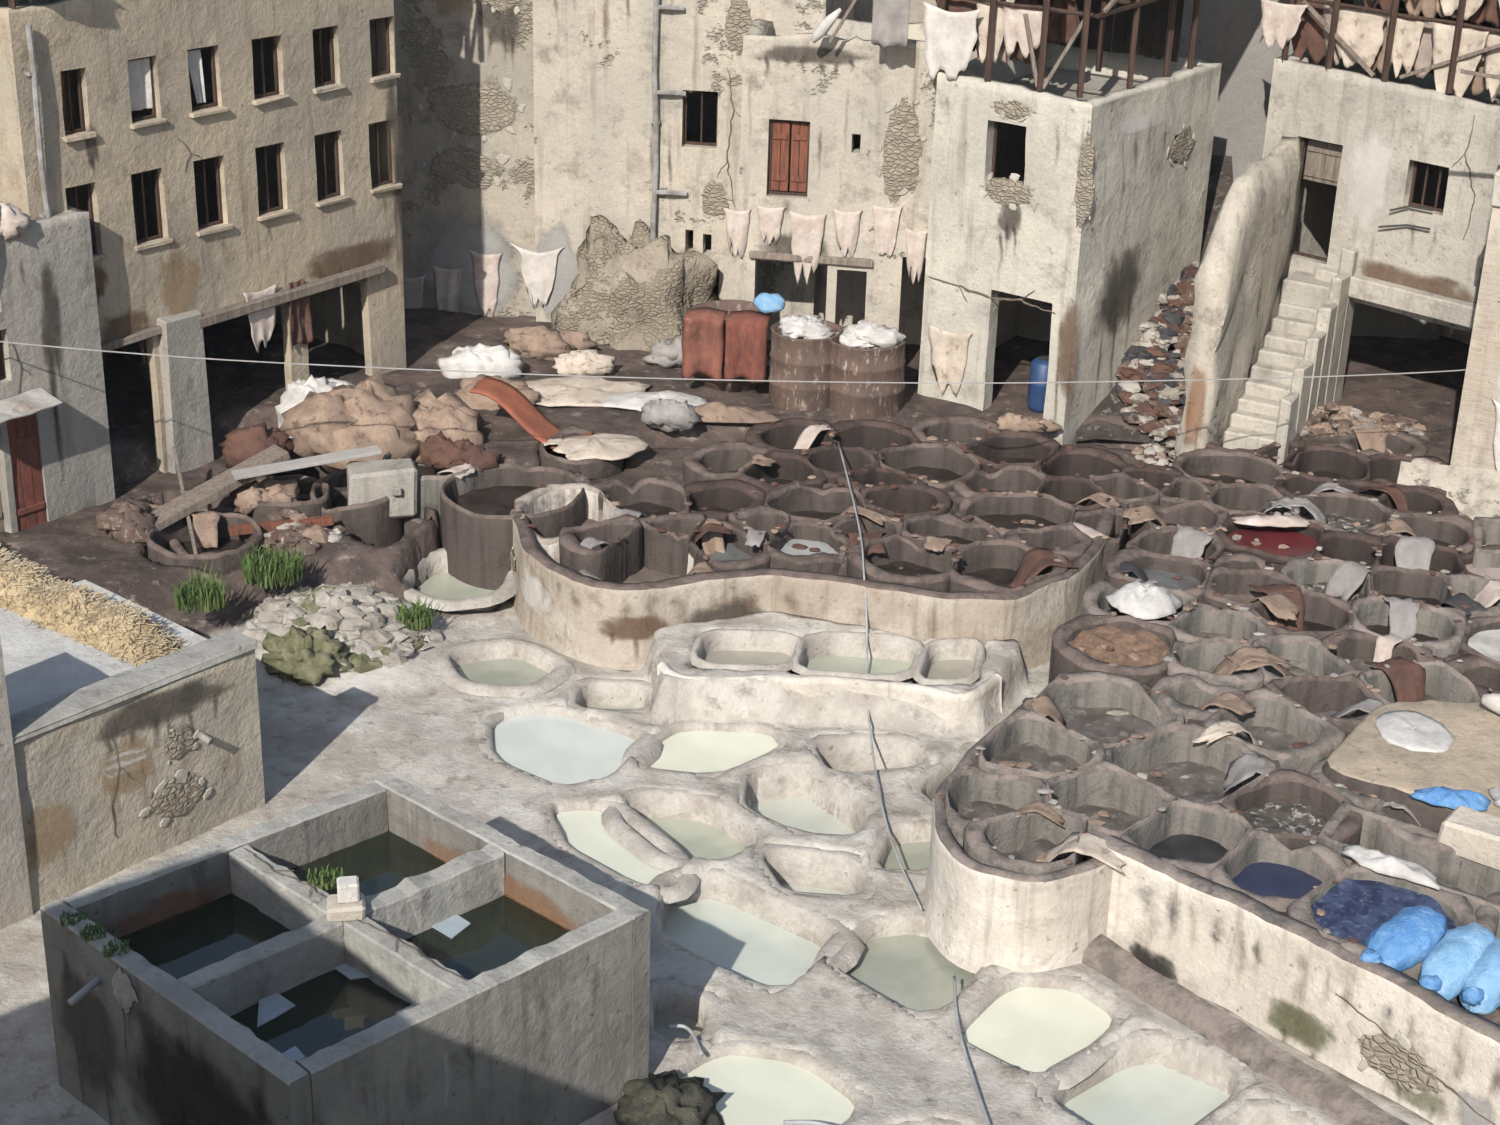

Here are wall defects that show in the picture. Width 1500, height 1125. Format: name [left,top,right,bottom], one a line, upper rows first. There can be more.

peeling [471,0,521,15]
peeling [722,0,752,59]
peeling [418,77,526,190]
peeling [877,93,927,207]
water stain [101,680,225,777]
peeling [138,723,212,827]